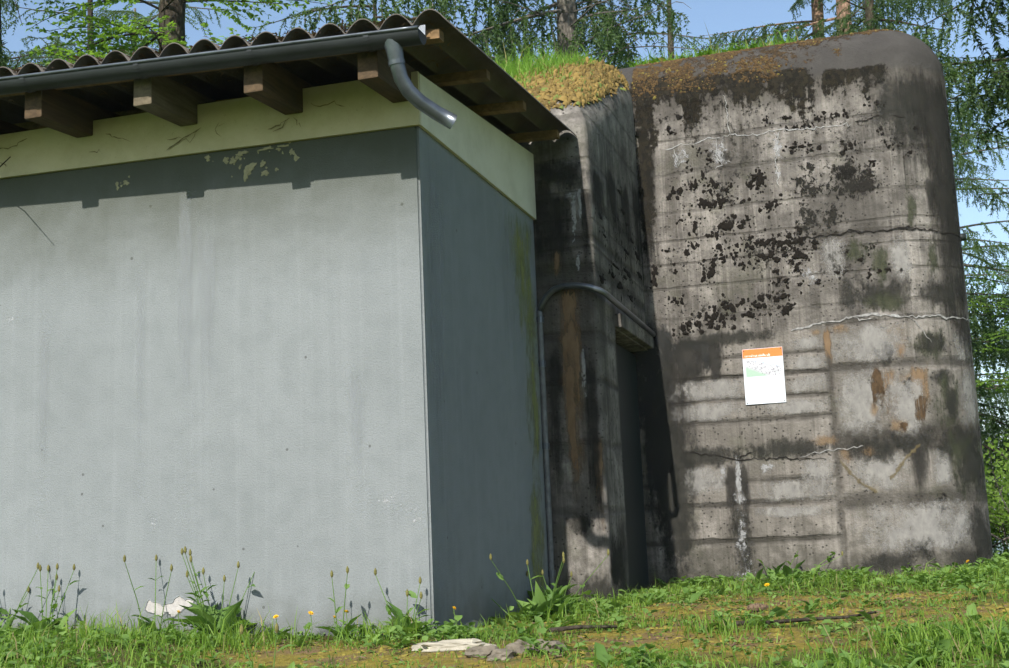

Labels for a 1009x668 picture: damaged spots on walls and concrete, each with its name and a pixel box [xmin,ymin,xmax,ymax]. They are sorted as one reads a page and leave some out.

peeling [223,142,300,182]
damp [823,74,971,358]
damp [511,105,659,477]
crack [791,312,969,342]
corrosion [560,289,585,483]
damp [631,324,772,578]
crack [690,445,863,461]
damp [751,438,827,472]
corrosion [871,367,929,432]
damp [849,369,985,495]
damp [581,538,624,602]
peeling [145,595,196,619]